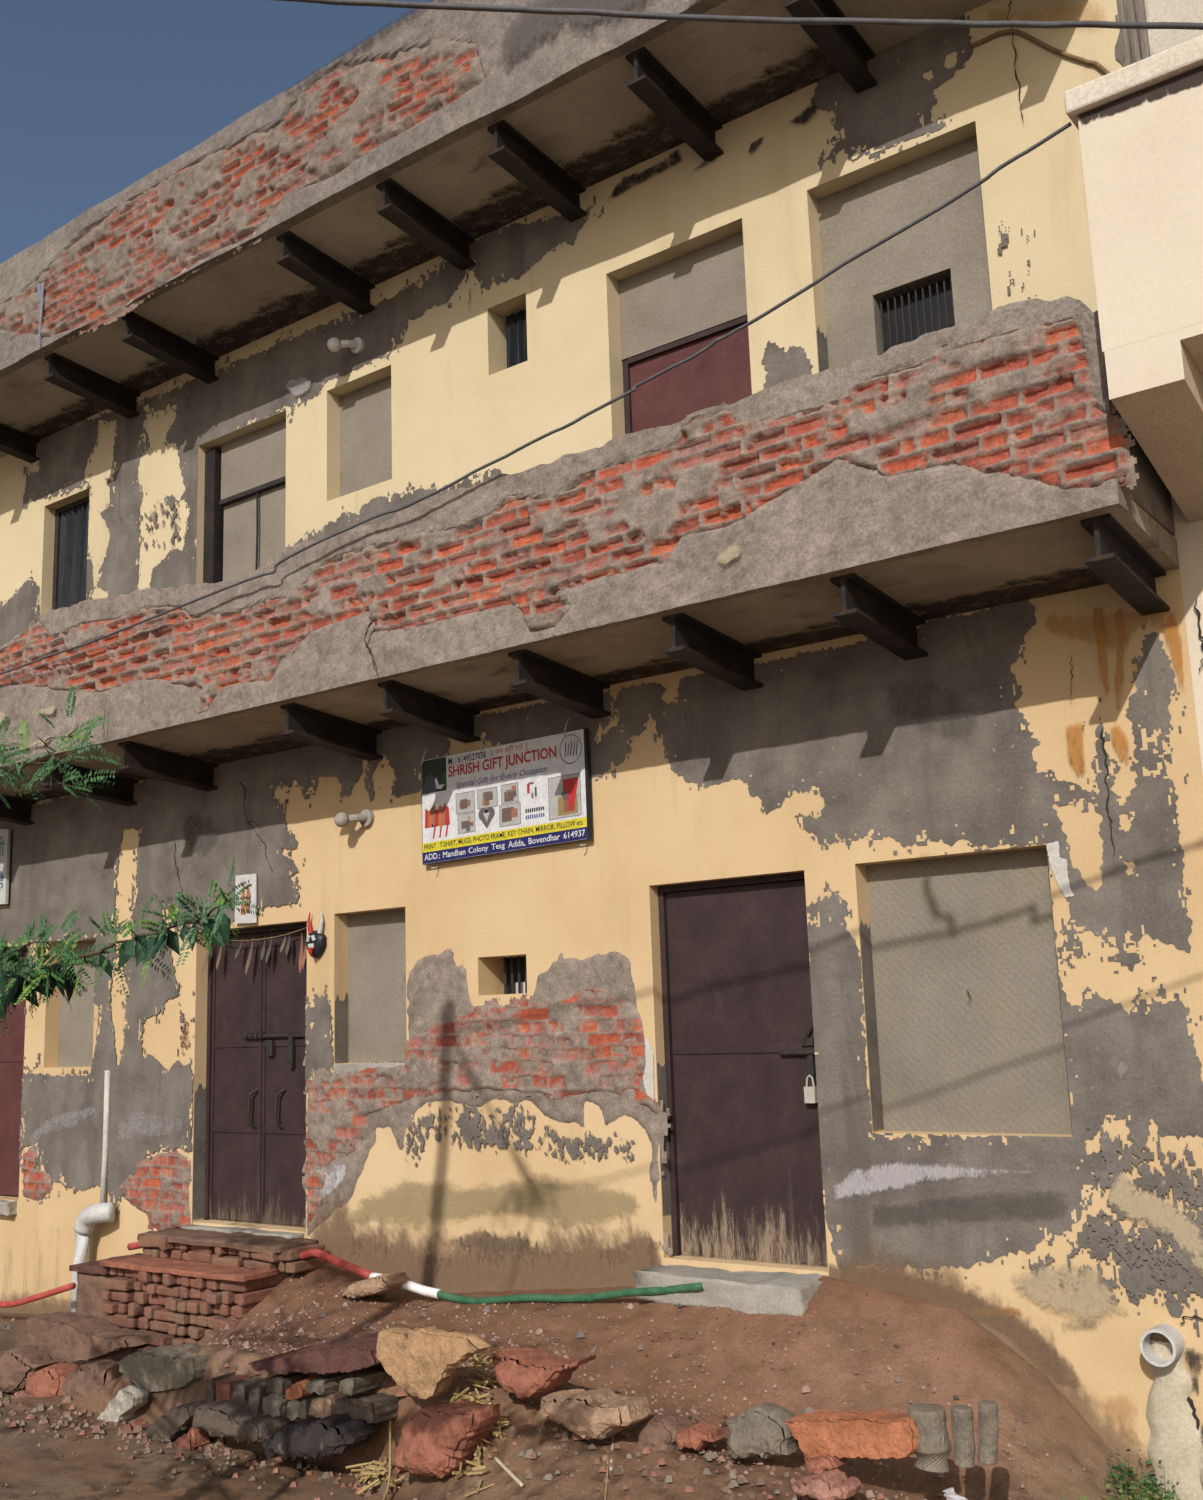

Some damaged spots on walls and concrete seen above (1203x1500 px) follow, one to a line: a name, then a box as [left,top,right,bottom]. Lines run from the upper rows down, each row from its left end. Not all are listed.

flaking render [0,37,485,342]
peeling [810,14,974,170]
peeling [997,221,1035,254]
peeling [21,195,603,600]
flaking render [0,319,1139,714]
crack [1194,599,1203,672]
peeling [0,725,449,1231]
flaking render [302,949,672,1256]
peeling [460,599,1203,1336]
spalling [172,1426,211,1450]